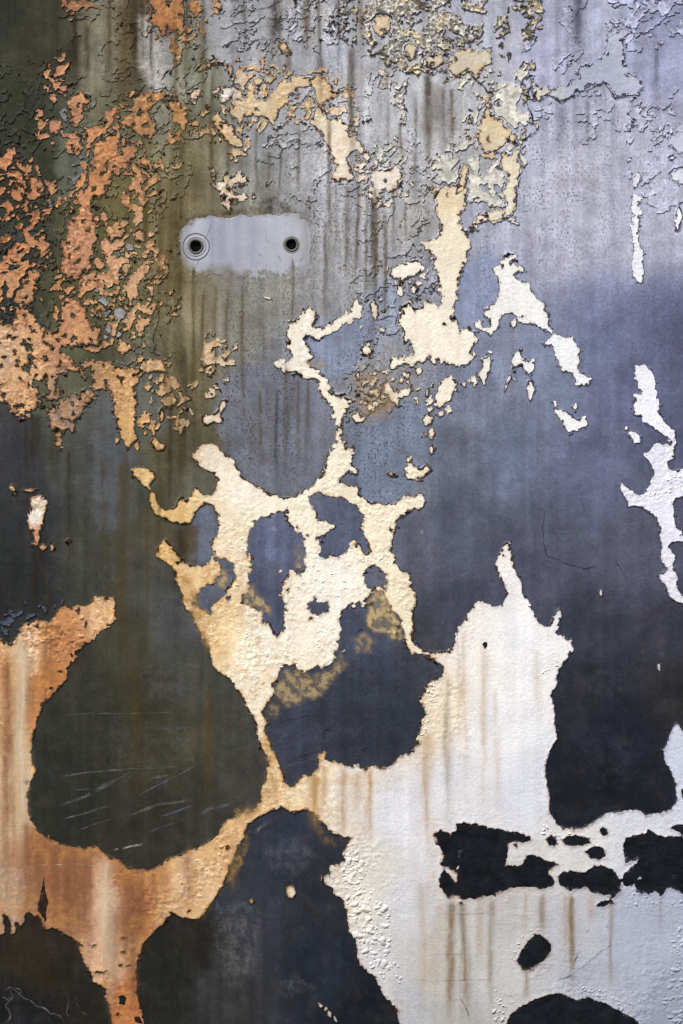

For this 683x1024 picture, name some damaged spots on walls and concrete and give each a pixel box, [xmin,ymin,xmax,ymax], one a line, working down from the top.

damp [273,0,281,33]
peeling [0,0,683,452]
damp [346,192,387,275]
rust [245,588,270,612]
peeling [0,299,683,1024]
rust [448,905,466,997]